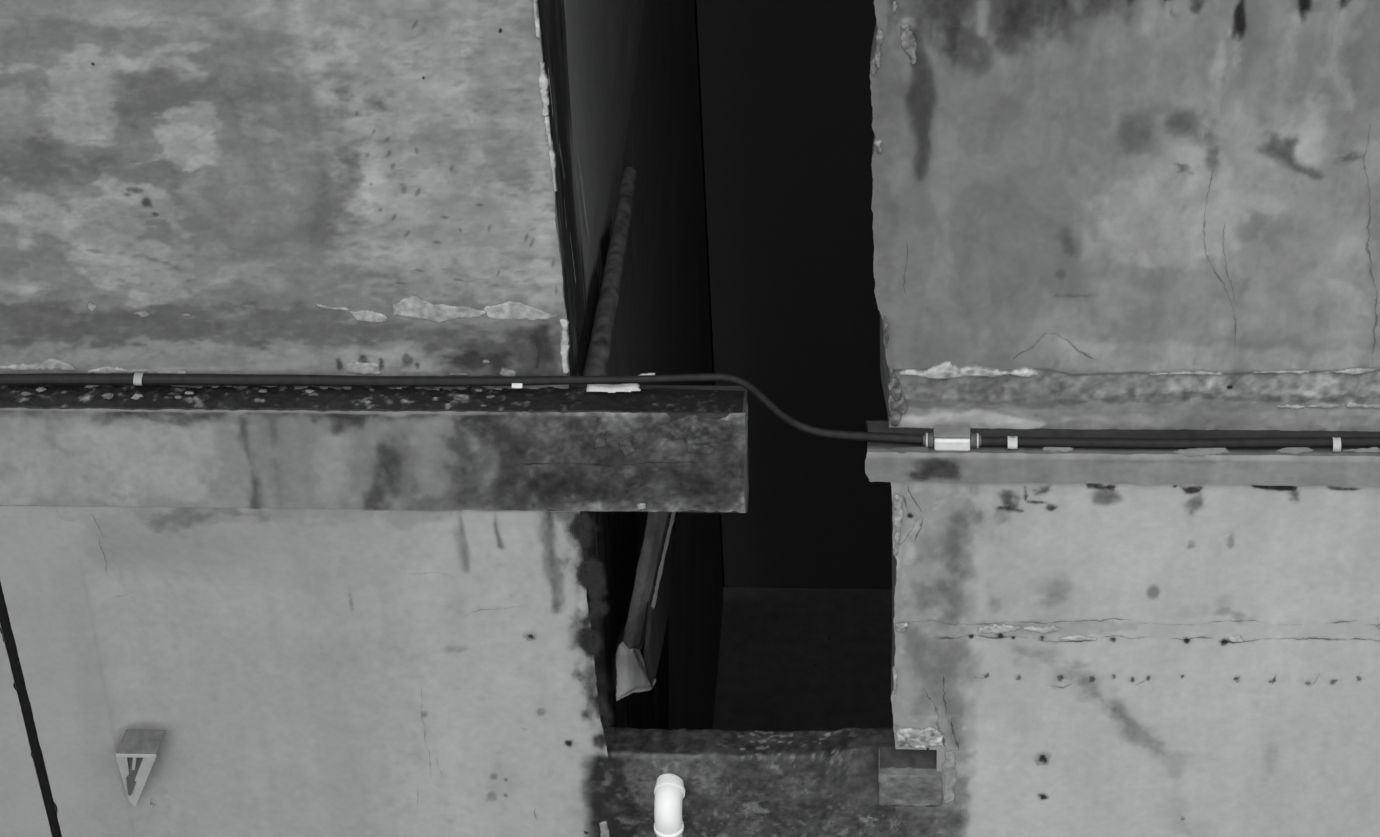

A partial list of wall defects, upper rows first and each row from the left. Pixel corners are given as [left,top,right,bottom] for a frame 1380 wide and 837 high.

damp [1232,0,1246,69]
damp [1299,0,1311,17]
spalling [539,62,556,191]
damp [907,32,935,178]
crack [1366,206,1378,349]
flaking render [317,296,569,376]
crack [984,618,1121,642]
crack [1294,620,1380,642]